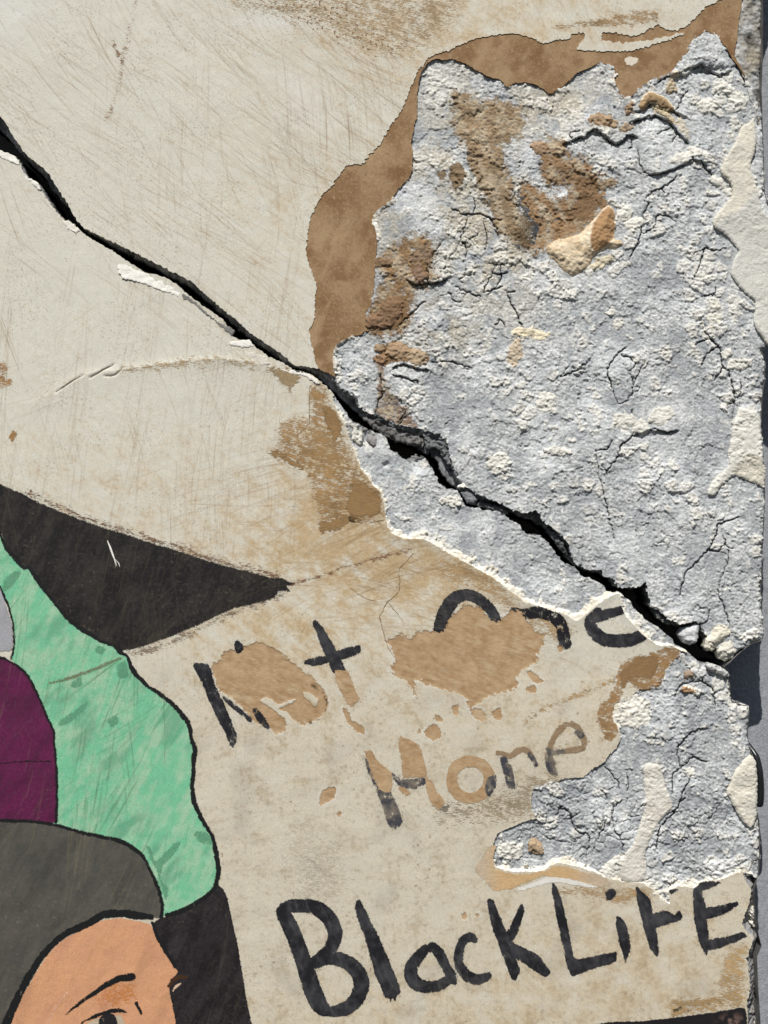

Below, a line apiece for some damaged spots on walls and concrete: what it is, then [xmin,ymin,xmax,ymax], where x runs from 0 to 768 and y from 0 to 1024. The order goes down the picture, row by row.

peeling [211,641,329,735]
crack [0,117,748,705]
spalling [305,0,768,1024]
crack [564,51,745,257]